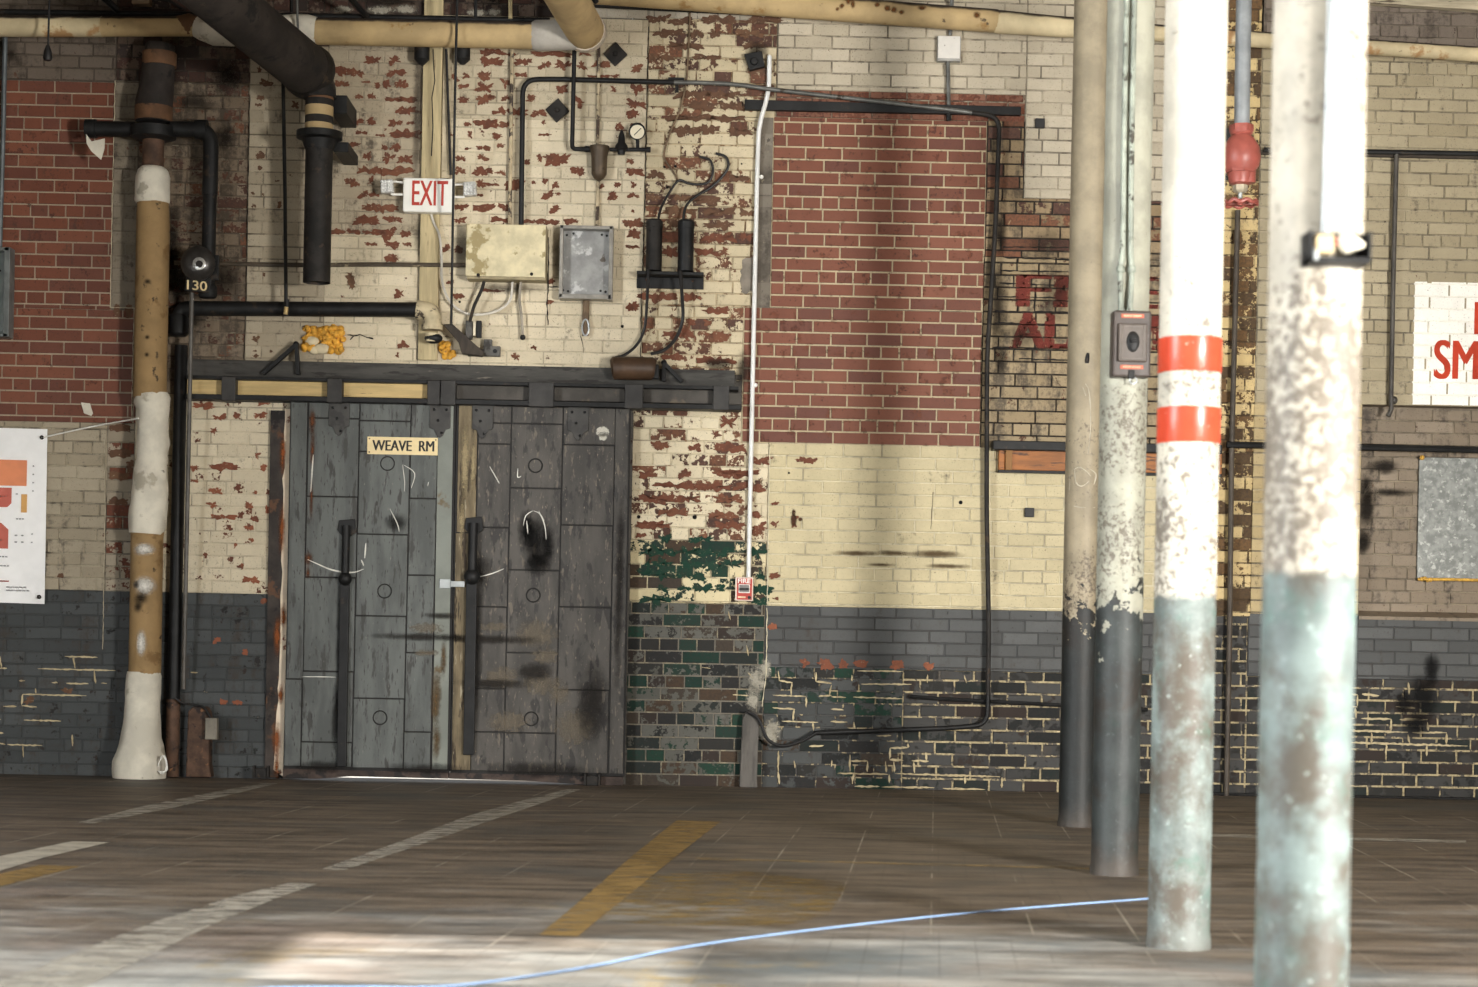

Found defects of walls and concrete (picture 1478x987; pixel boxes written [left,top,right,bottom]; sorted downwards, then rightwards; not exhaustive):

peeling [255,66,274,107]
peeling [251,151,282,208]
peeling [331,55,422,262]
peeling [441,14,783,225]
peeling [600,158,754,258]
peeling [345,272,355,290]
peeling [626,292,737,364]
peeling [192,402,270,434]
peeling [108,424,134,506]
peeling [795,456,818,464]
peeling [190,453,269,604]
peeling [635,415,799,606]